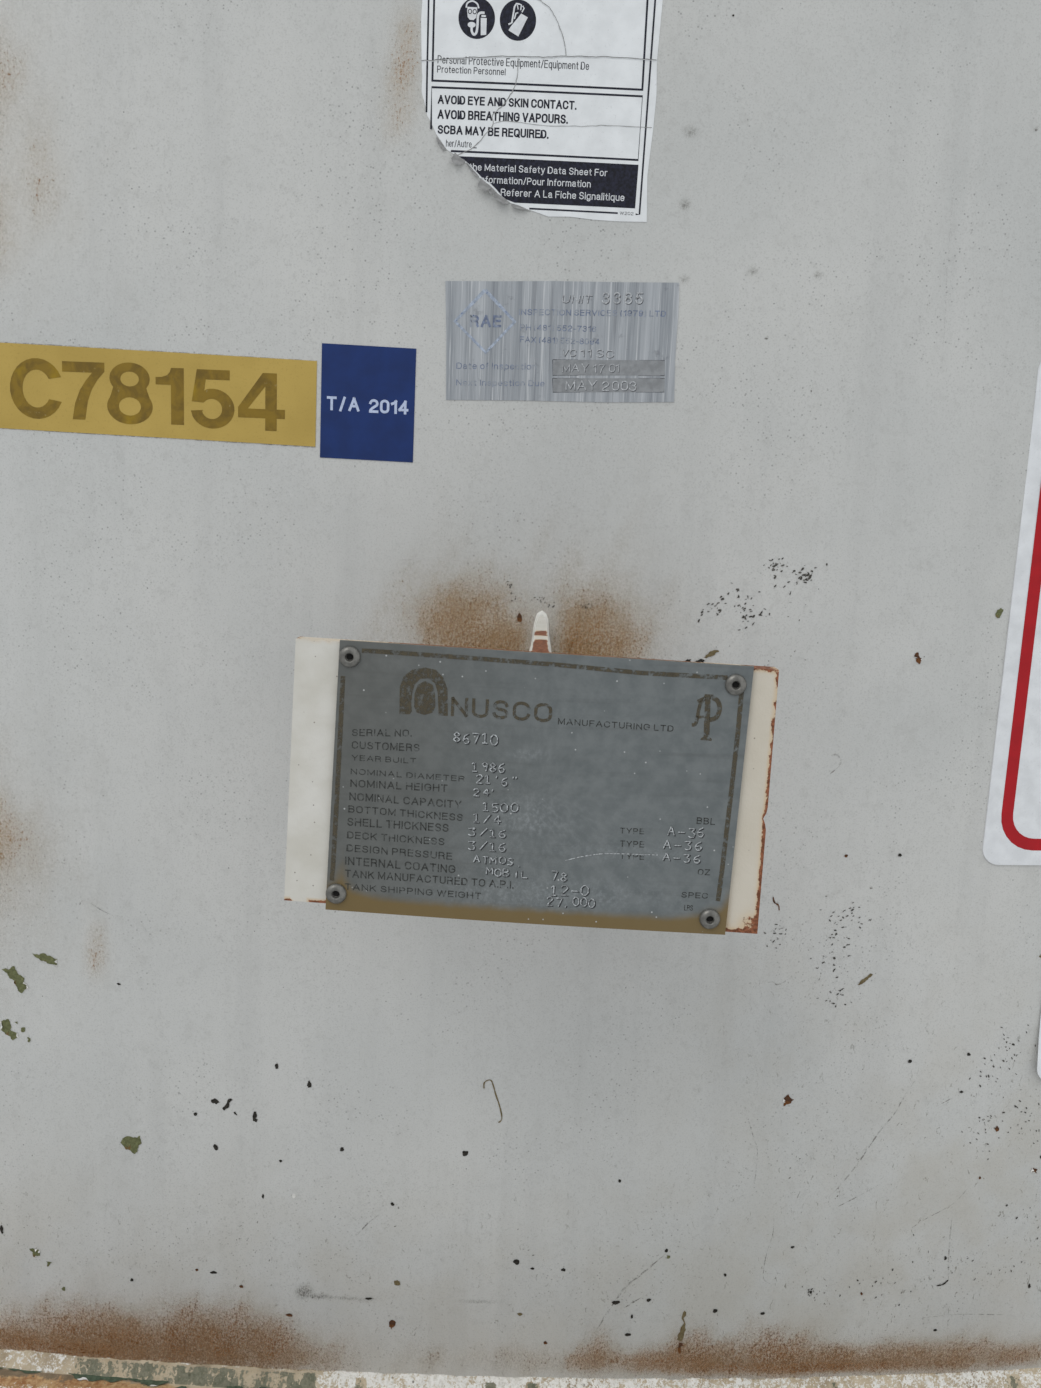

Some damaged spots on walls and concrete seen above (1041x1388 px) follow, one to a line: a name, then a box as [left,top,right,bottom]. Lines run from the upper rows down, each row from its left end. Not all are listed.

corrosion [400,572,531,650]
corrosion [552,584,656,658]
peeling [2,966,28,993]
peeling [33,953,57,966]
peeling [1,1019,30,1042]
corrosion [0,1298,354,1369]
corrosion [501,1325,1040,1378]